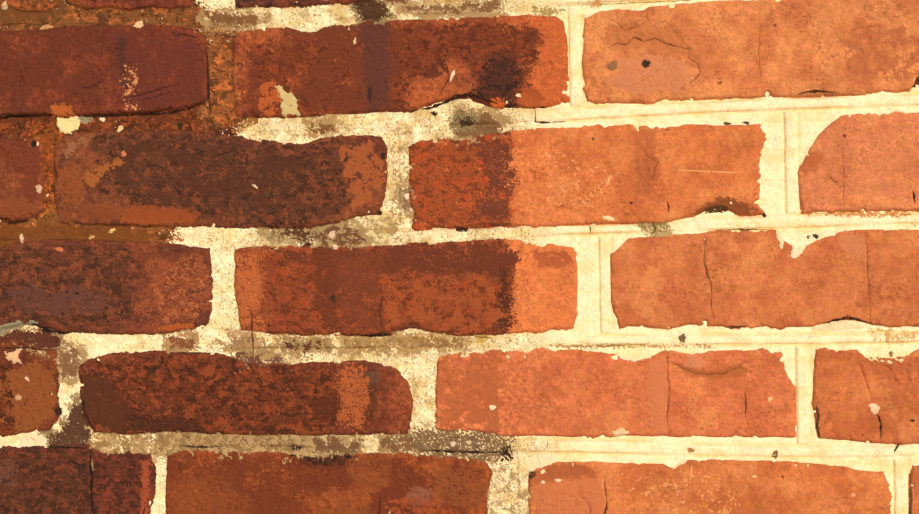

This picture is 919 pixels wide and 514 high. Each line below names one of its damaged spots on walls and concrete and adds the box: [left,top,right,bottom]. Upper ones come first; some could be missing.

leakage [443,102,513,150]
crack [860,366,900,452]